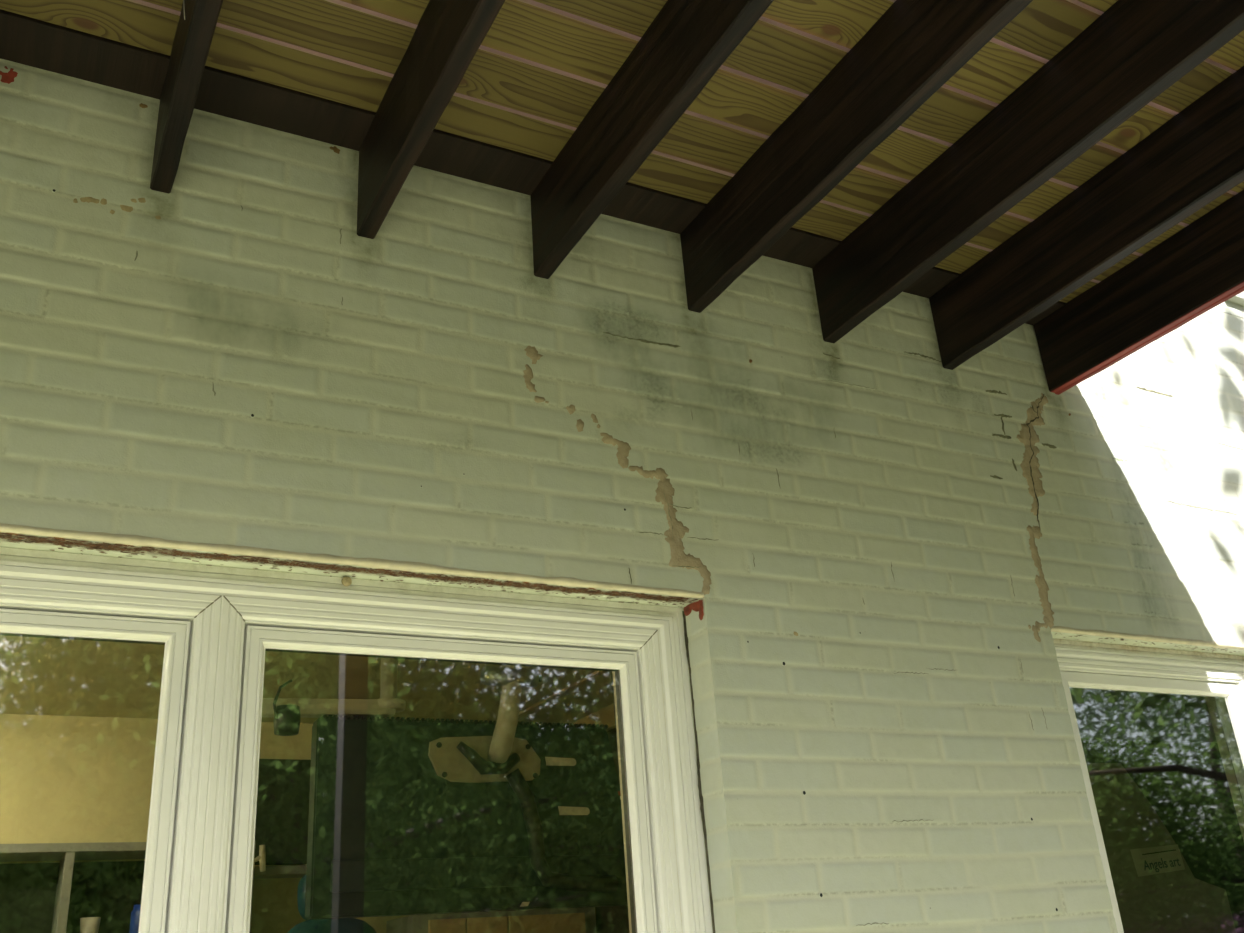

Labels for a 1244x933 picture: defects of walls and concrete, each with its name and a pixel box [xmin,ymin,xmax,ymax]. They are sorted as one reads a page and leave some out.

rust [0,533,698,607]
crack [523,345,715,933]
crack [985,390,1057,672]